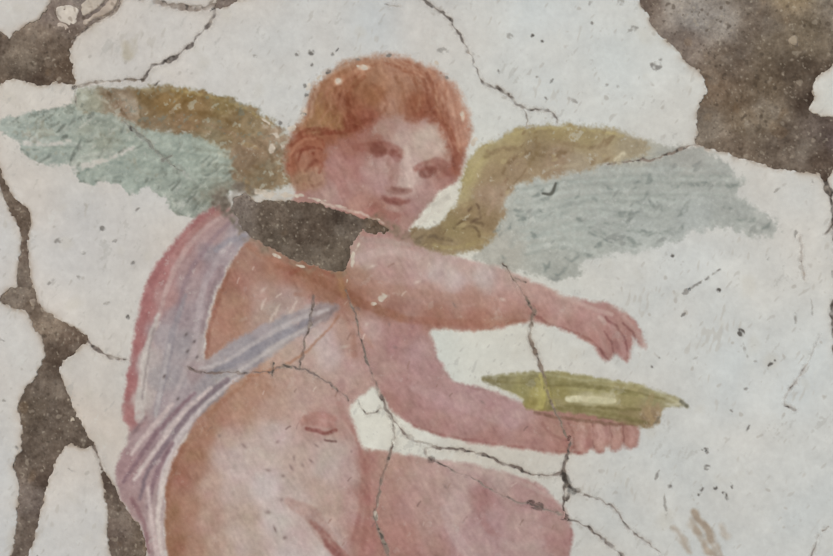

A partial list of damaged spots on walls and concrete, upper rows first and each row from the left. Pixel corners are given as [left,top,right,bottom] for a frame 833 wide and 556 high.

crack [383,0,561,131]
spalling [640,0,833,187]
spalling [190,178,459,284]
spalling [681,267,722,296]
crack [781,174,833,414]
crack [183,260,664,556]
crack [808,524,831,556]